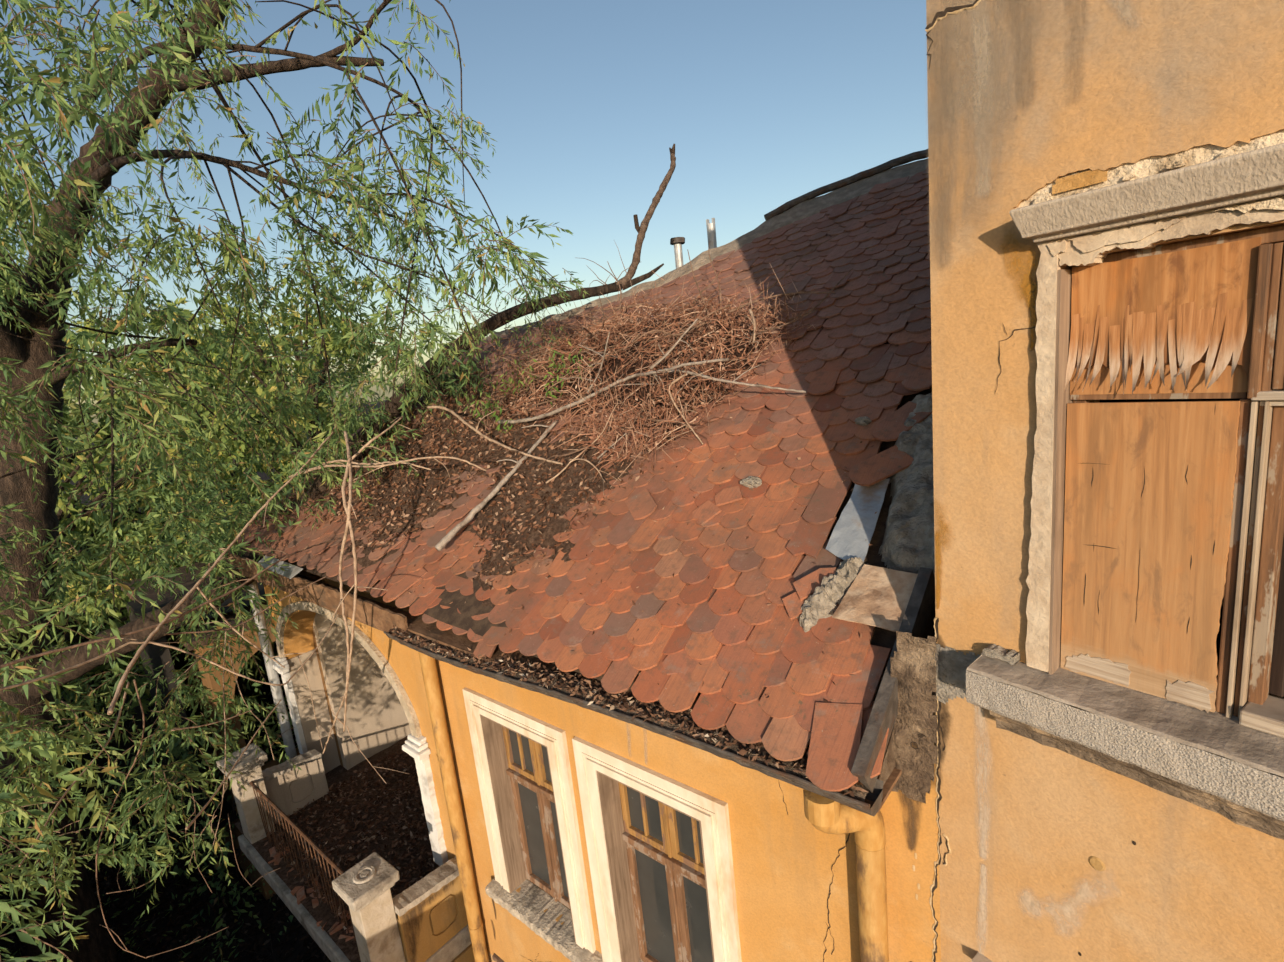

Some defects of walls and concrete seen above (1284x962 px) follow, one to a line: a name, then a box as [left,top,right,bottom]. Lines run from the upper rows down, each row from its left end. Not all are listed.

crack [925,0,982,69]
peeling [1015,130,1284,209]
peeling [1042,196,1284,266]
crack [995,325,1036,392]
crack [932,617,940,658]
crack [929,696,951,962]
crack [823,833,850,962]